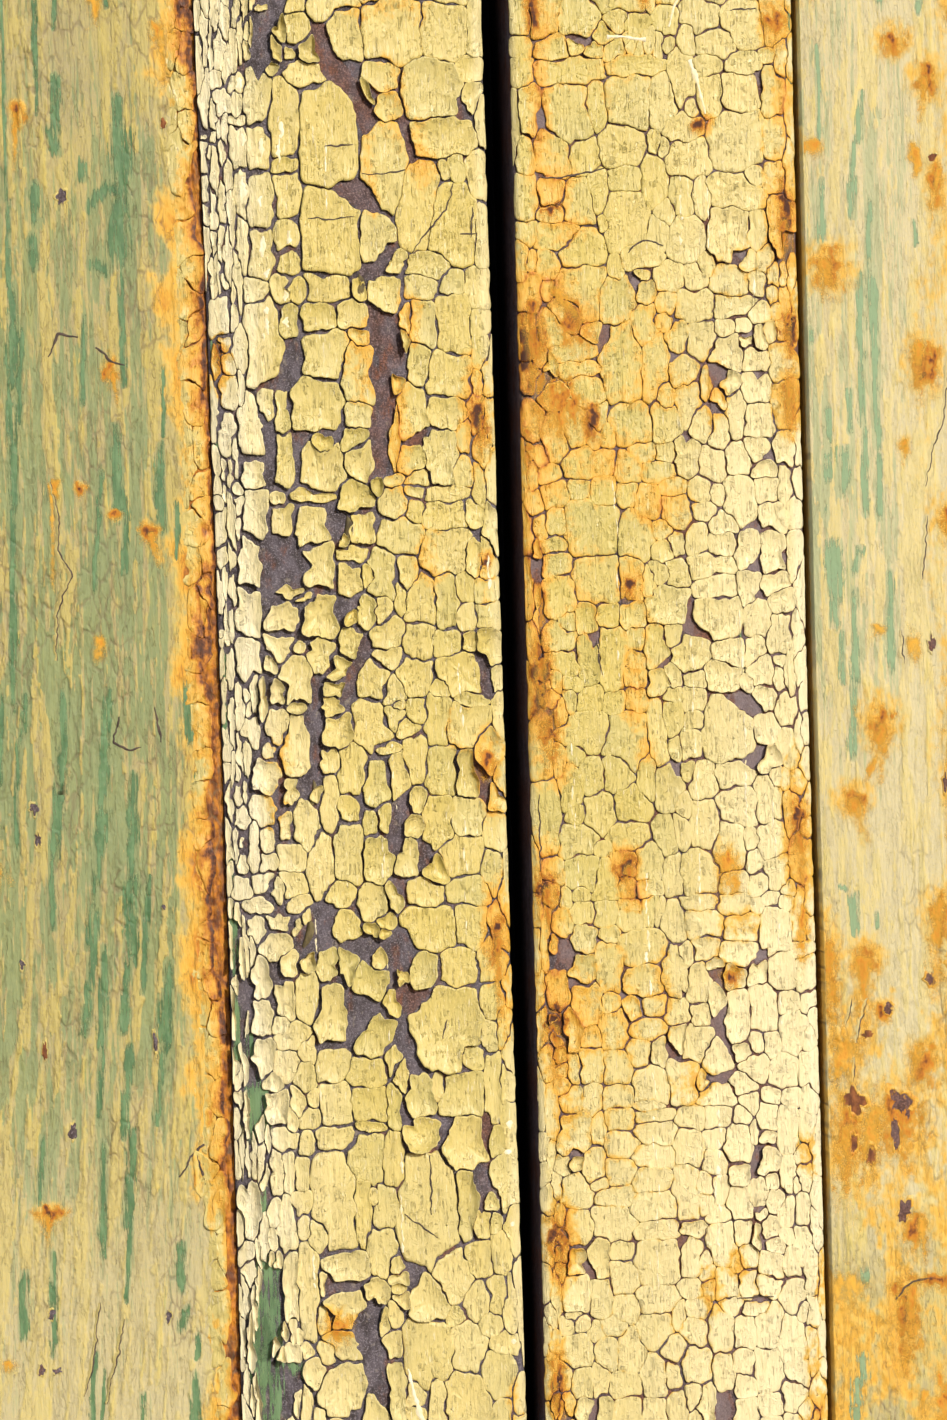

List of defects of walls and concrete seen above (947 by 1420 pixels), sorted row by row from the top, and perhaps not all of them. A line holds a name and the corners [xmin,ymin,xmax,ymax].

peeling [236,0,418,164]
rust [778,179,793,249]
rust [907,143,944,211]
rust [519,286,600,468]
rust [910,340,942,396]
peeling [236,236,428,807]
peeling [435,606,503,727]
crack [179,0,868,1420]
peeling [251,786,450,1076]
rust [825,941,936,1194]
peeling [386,1083,513,1243]
peeling [312,1195,428,1420]